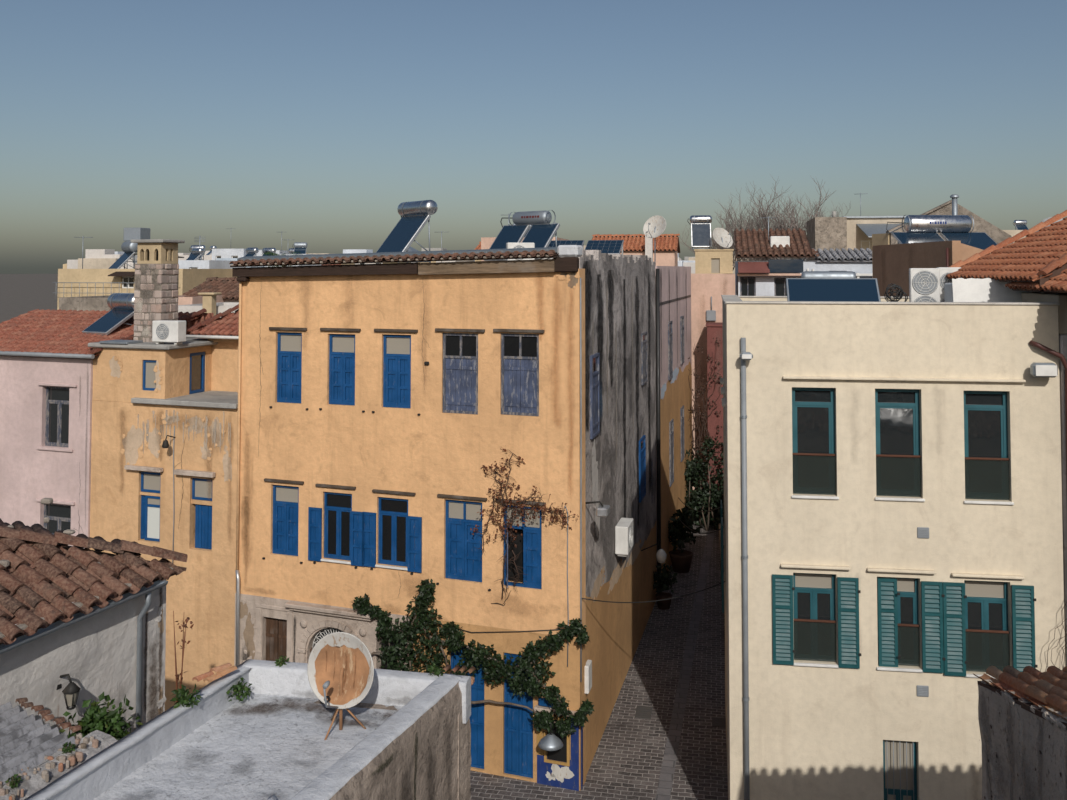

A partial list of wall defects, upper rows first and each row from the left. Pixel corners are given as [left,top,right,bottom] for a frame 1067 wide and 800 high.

peeling [120,414,232,482]